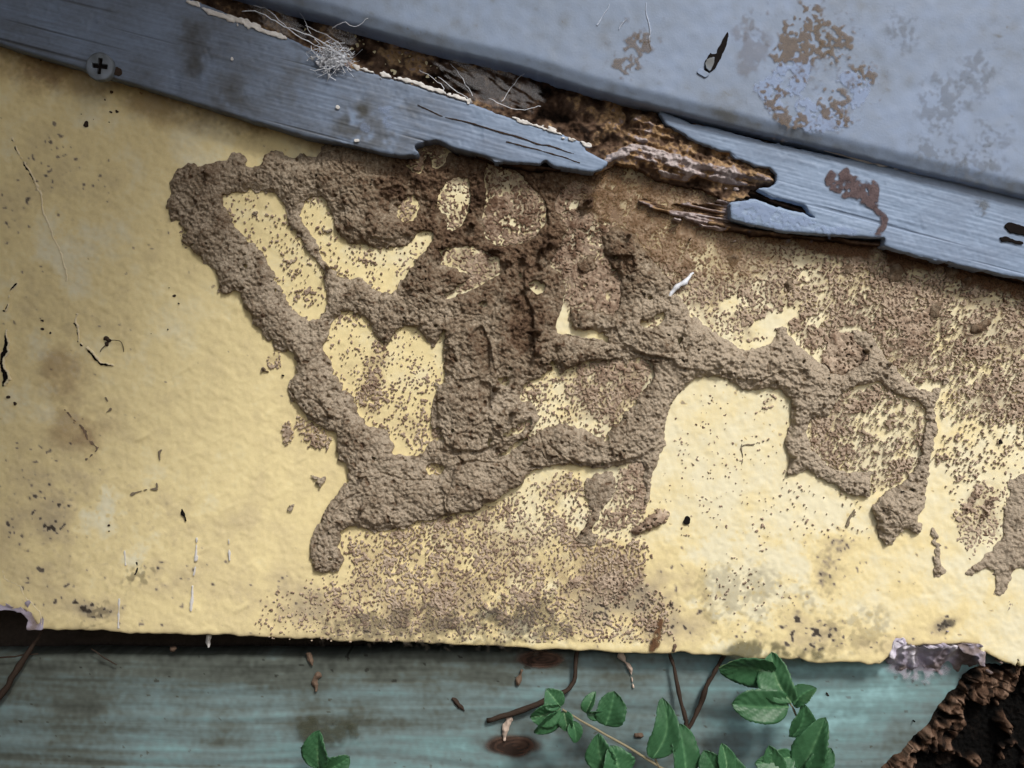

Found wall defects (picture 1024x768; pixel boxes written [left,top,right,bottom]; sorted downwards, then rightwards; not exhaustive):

hole [697,32,729,78]
peeling [755,57,871,132]
crack [418,105,580,163]
crack [0,282,18,386]
crack [73,313,114,366]
spalling [0,600,44,631]
spalling [885,631,1003,675]